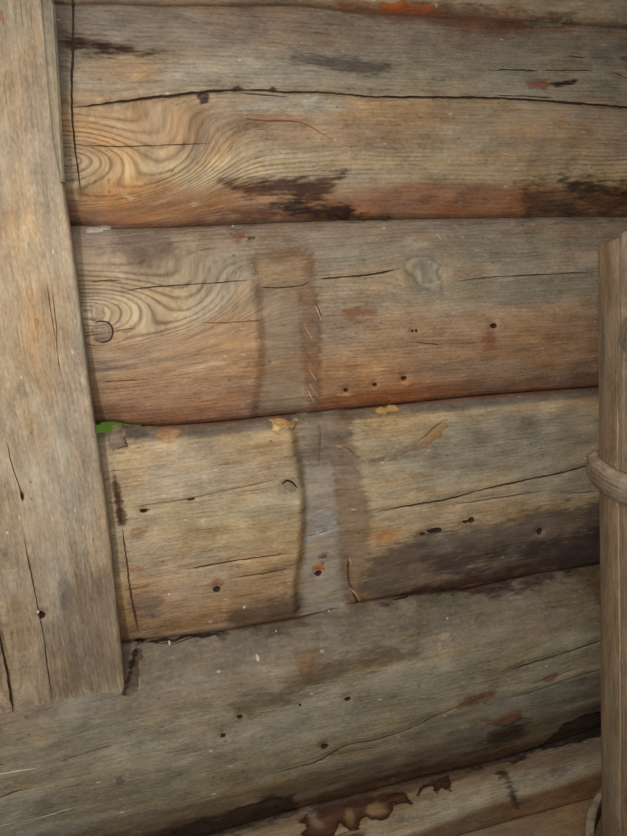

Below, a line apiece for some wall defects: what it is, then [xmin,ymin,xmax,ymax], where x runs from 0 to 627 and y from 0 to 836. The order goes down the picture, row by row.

crack [495,55,589,71]
crack [71,89,627,108]
crack [86,141,210,149]
crack [241,117,331,139]
damp [218,168,391,221]
damp [523,183,627,221]
crack [374,465,586,513]
crack [0,635,13,710]
damp [149,712,601,836]